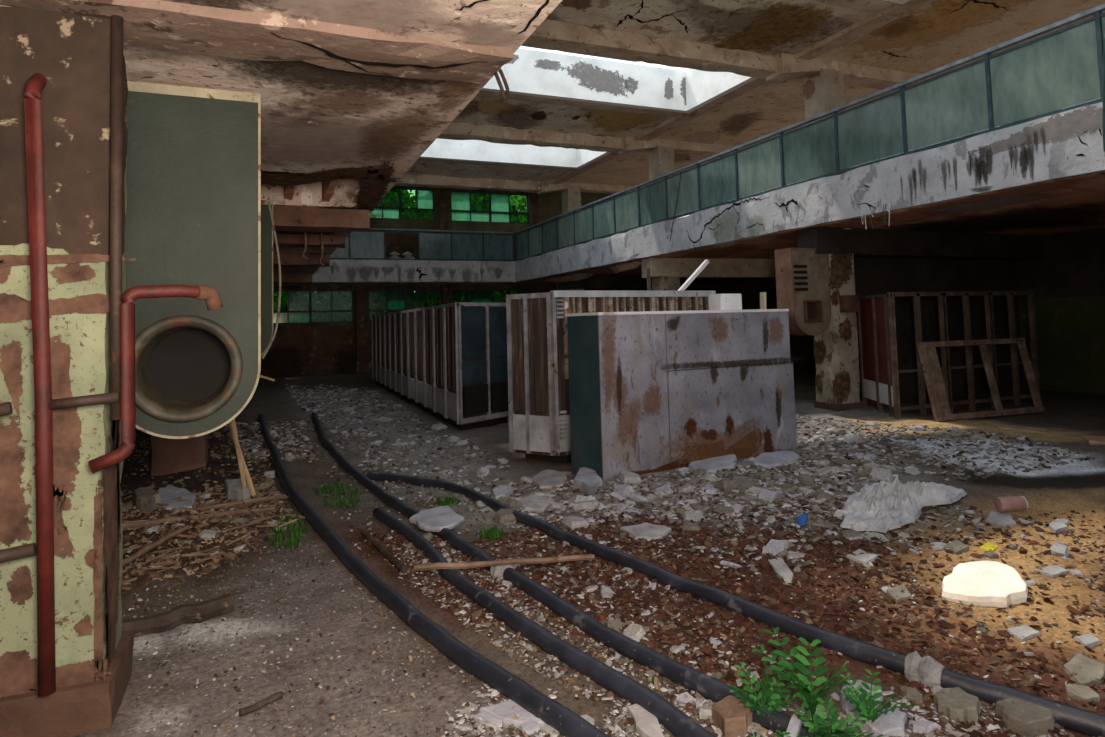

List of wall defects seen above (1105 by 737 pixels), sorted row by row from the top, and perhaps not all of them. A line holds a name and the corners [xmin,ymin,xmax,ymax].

crack [454,0,489,10]
crack [517,0,549,34]
crack [615,0,689,35]
crack [945,0,1014,14]
damp [1009,130,1045,177]
spalling [261,156,403,226]
damp [888,148,1105,233]
crack [685,196,822,250]
peeling [0,255,32,323]
peeling [0,340,36,548]
peeling [49,293,123,688]
peeling [0,650,38,698]